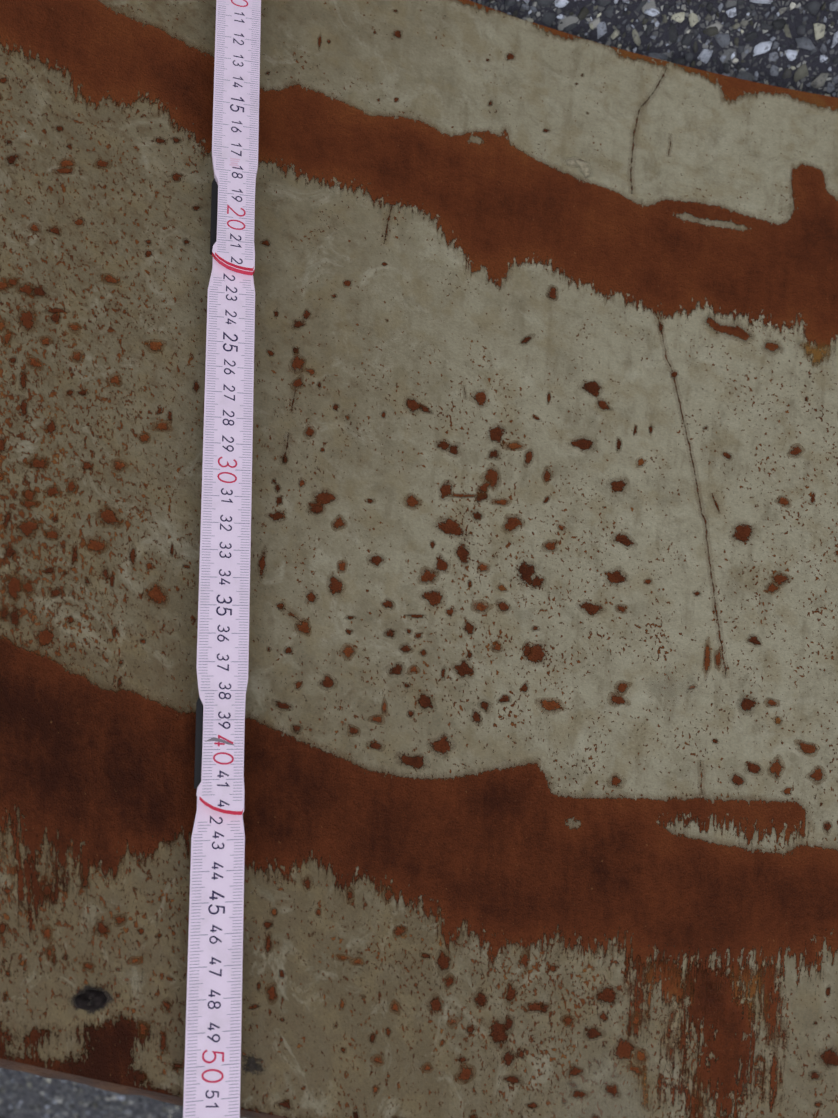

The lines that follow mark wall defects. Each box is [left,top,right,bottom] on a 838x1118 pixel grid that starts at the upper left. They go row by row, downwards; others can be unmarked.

rust [0,0,216,1097]
rust [458,0,513,18]
rust [241,20,838,1118]
crack [630,74,664,194]